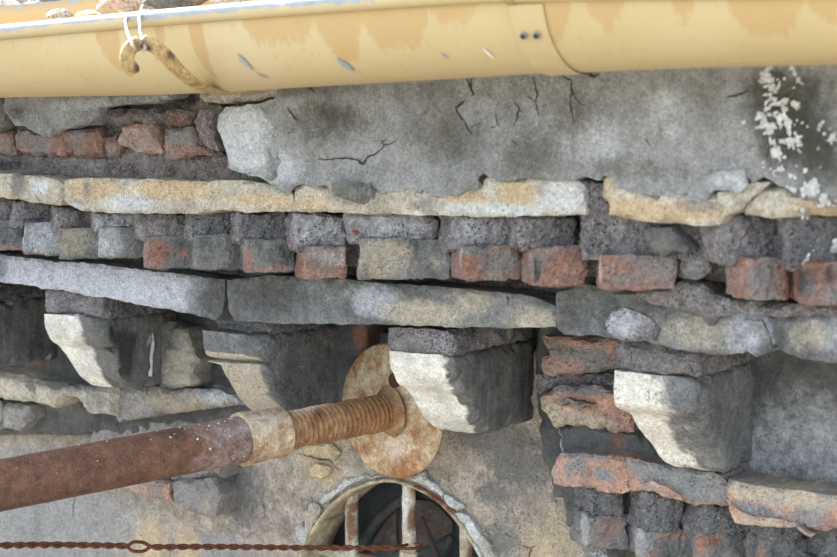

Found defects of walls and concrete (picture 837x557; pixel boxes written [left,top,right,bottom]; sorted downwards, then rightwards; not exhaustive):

spalling [0,89,278,159]
crack [319,139,398,165]
crack [455,78,474,134]
crack [512,77,539,145]
crack [562,74,600,121]
water stain [752,79,836,175]
flaking render [686,168,751,203]
flaking render [536,306,661,456]
spalling [638,480,687,501]
spalling [725,497,822,537]